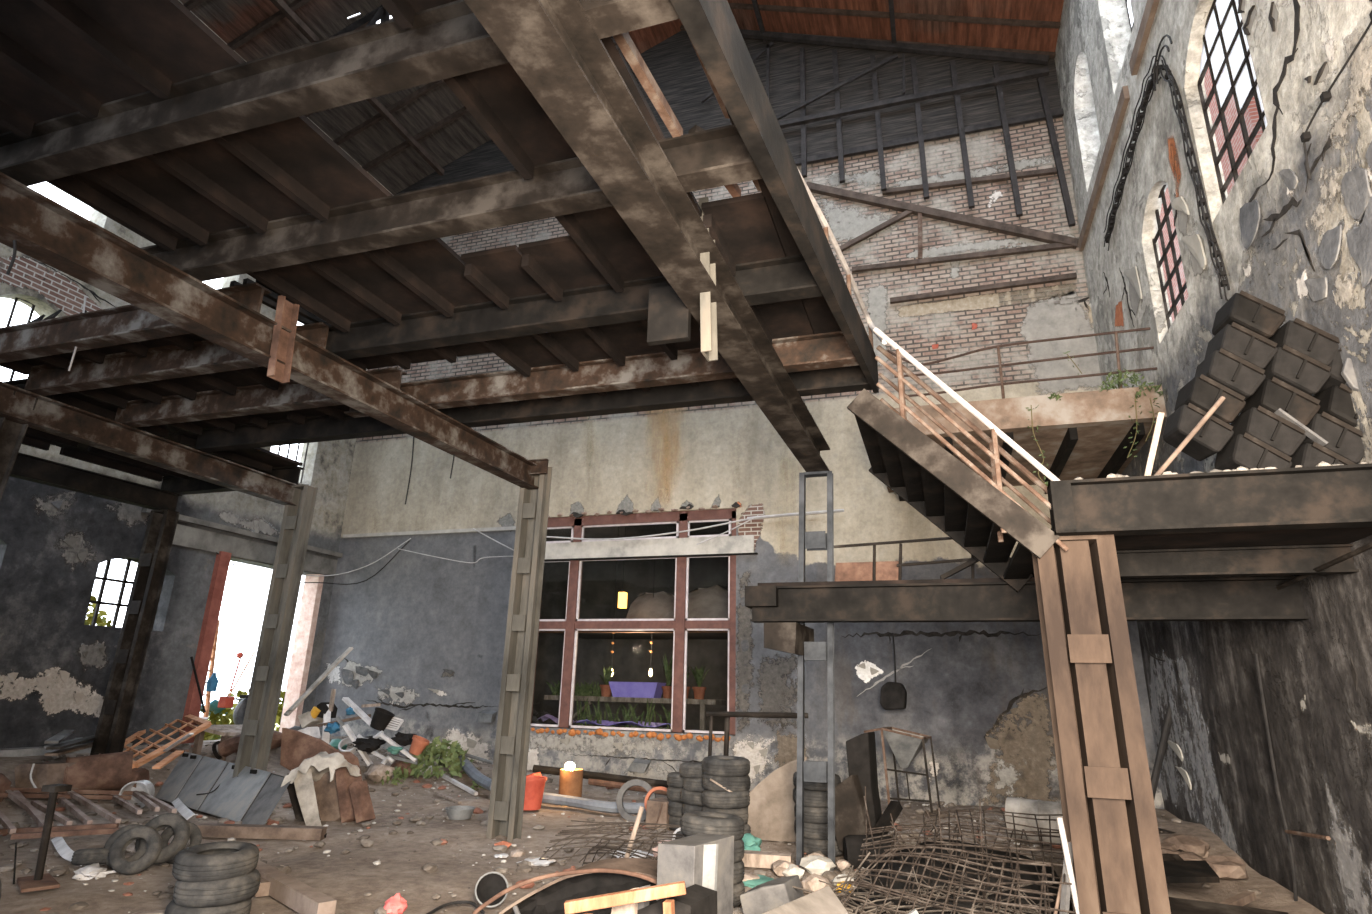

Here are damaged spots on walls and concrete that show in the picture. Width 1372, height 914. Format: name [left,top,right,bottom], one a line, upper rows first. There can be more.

flaking render [1238,0,1279,35]
spalling [1304,27,1372,147]
crack [1248,0,1360,272]
flaking render [1279,169,1298,195]
flaking render [1239,199,1263,279]
flaking render [1295,141,1372,311]
flaking render [0,256,102,316]
flaking render [33,490,97,571]
flaking render [104,502,149,527]
flaking render [341,661,454,705]
spalling [838,693,1076,914]
water stain [1325,781,1372,914]